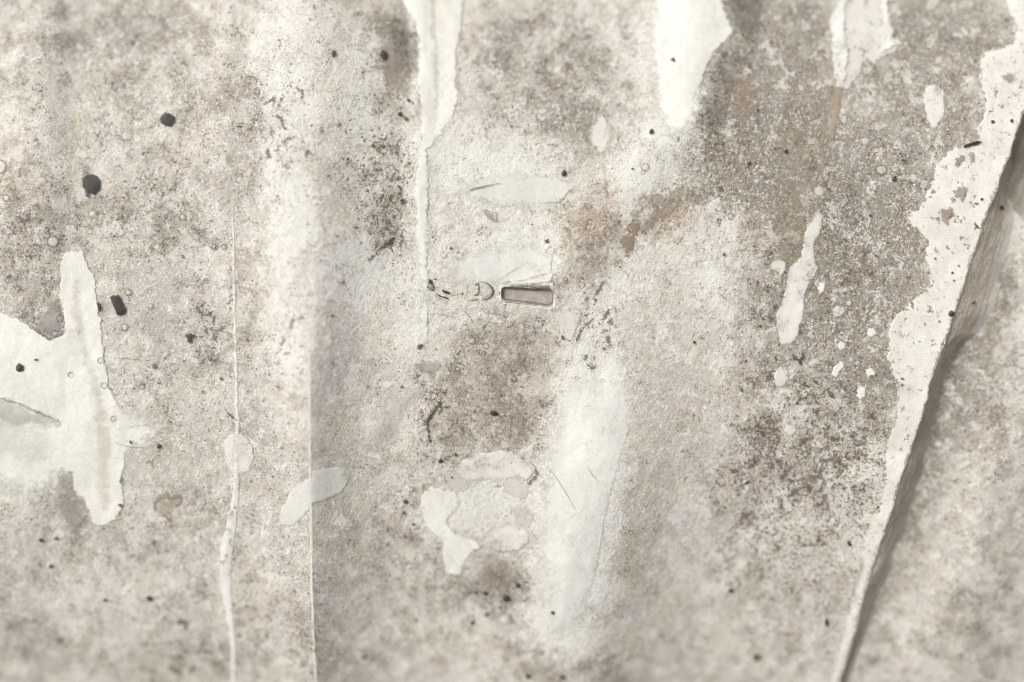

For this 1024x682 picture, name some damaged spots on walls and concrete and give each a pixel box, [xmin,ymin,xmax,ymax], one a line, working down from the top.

damp [29,298,65,340]
peeling [828,0,1024,682]
crack [740,352,835,485]
peeling [421,450,533,576]